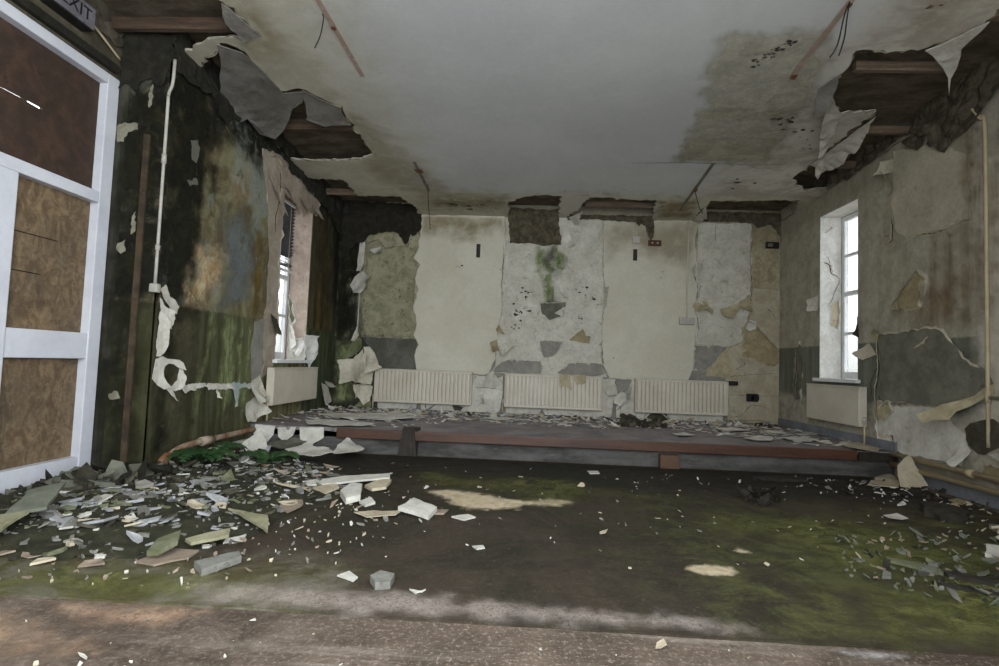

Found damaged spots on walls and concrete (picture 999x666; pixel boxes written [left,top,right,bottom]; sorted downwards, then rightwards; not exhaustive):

damp [679,33,822,162]
damp [99,74,263,464]
peeling [118,32,422,370]
spalling [508,207,654,248]
spalling [246,287,854,446]
peeling [852,317,995,423]
spalling [946,419,999,488]